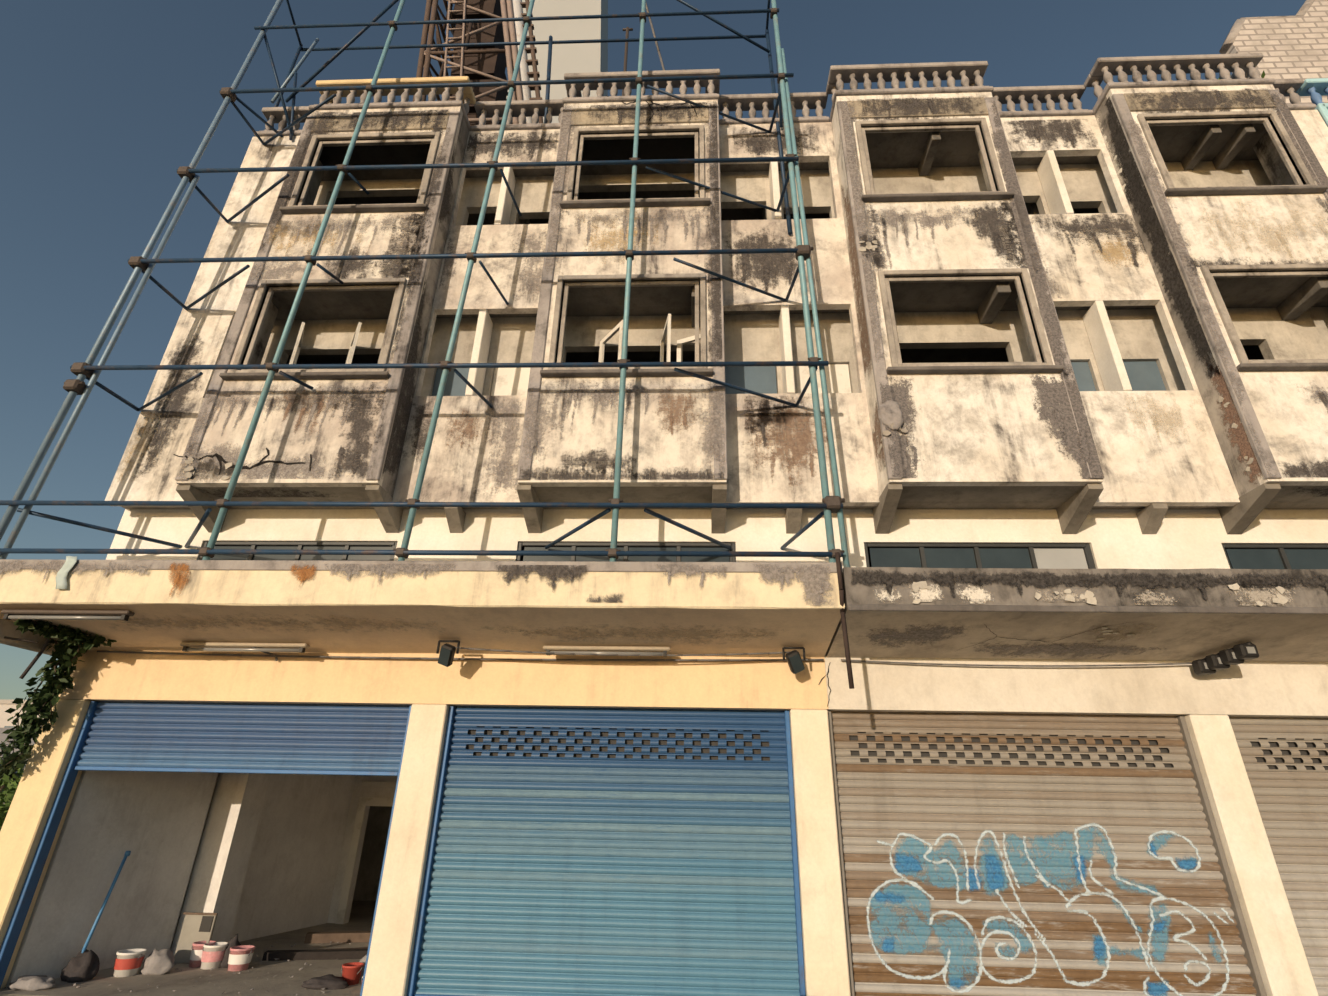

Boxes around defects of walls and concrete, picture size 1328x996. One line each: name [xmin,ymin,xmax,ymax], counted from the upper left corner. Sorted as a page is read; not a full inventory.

water stain [840,88,1328,479]
water stain [122,101,828,497]
crack [173,447,312,475]
water stain [1248,424,1328,497]
corrosion [169,563,190,596]
corrosion [291,565,316,584]
water stain [498,565,586,590]
peeling [876,581,942,604]
peeling [958,580,994,603]
peeling [1035,587,1098,605]
water stain [851,570,1328,600]
peeling [1228,583,1295,607]